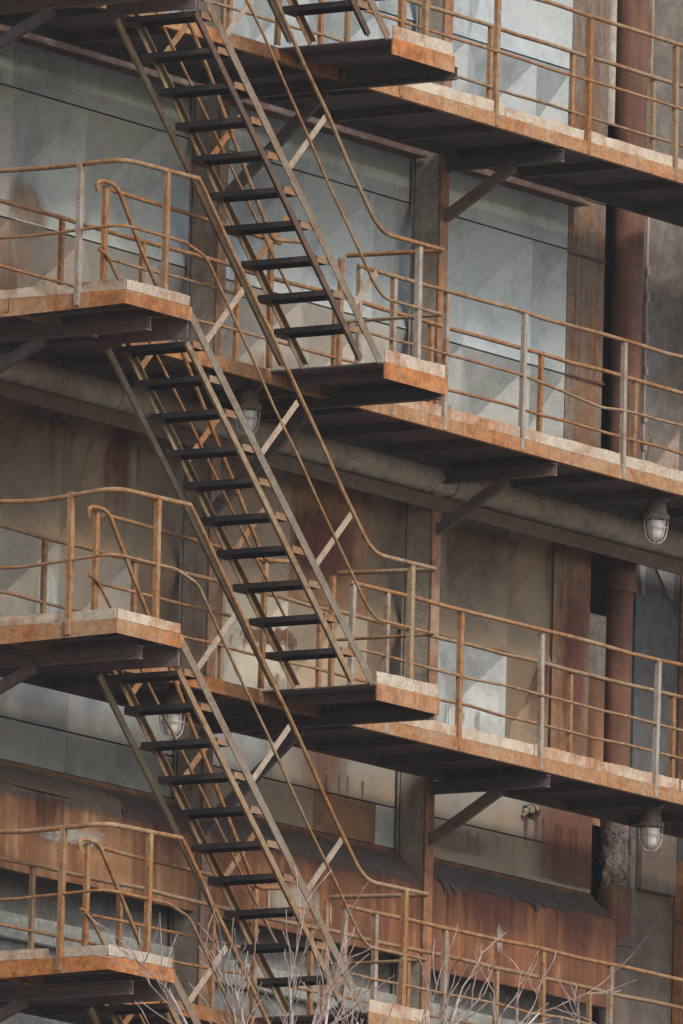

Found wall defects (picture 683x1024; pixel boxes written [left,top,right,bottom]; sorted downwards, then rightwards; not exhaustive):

rust [298,504,351,575]
rust [561,579,589,724]